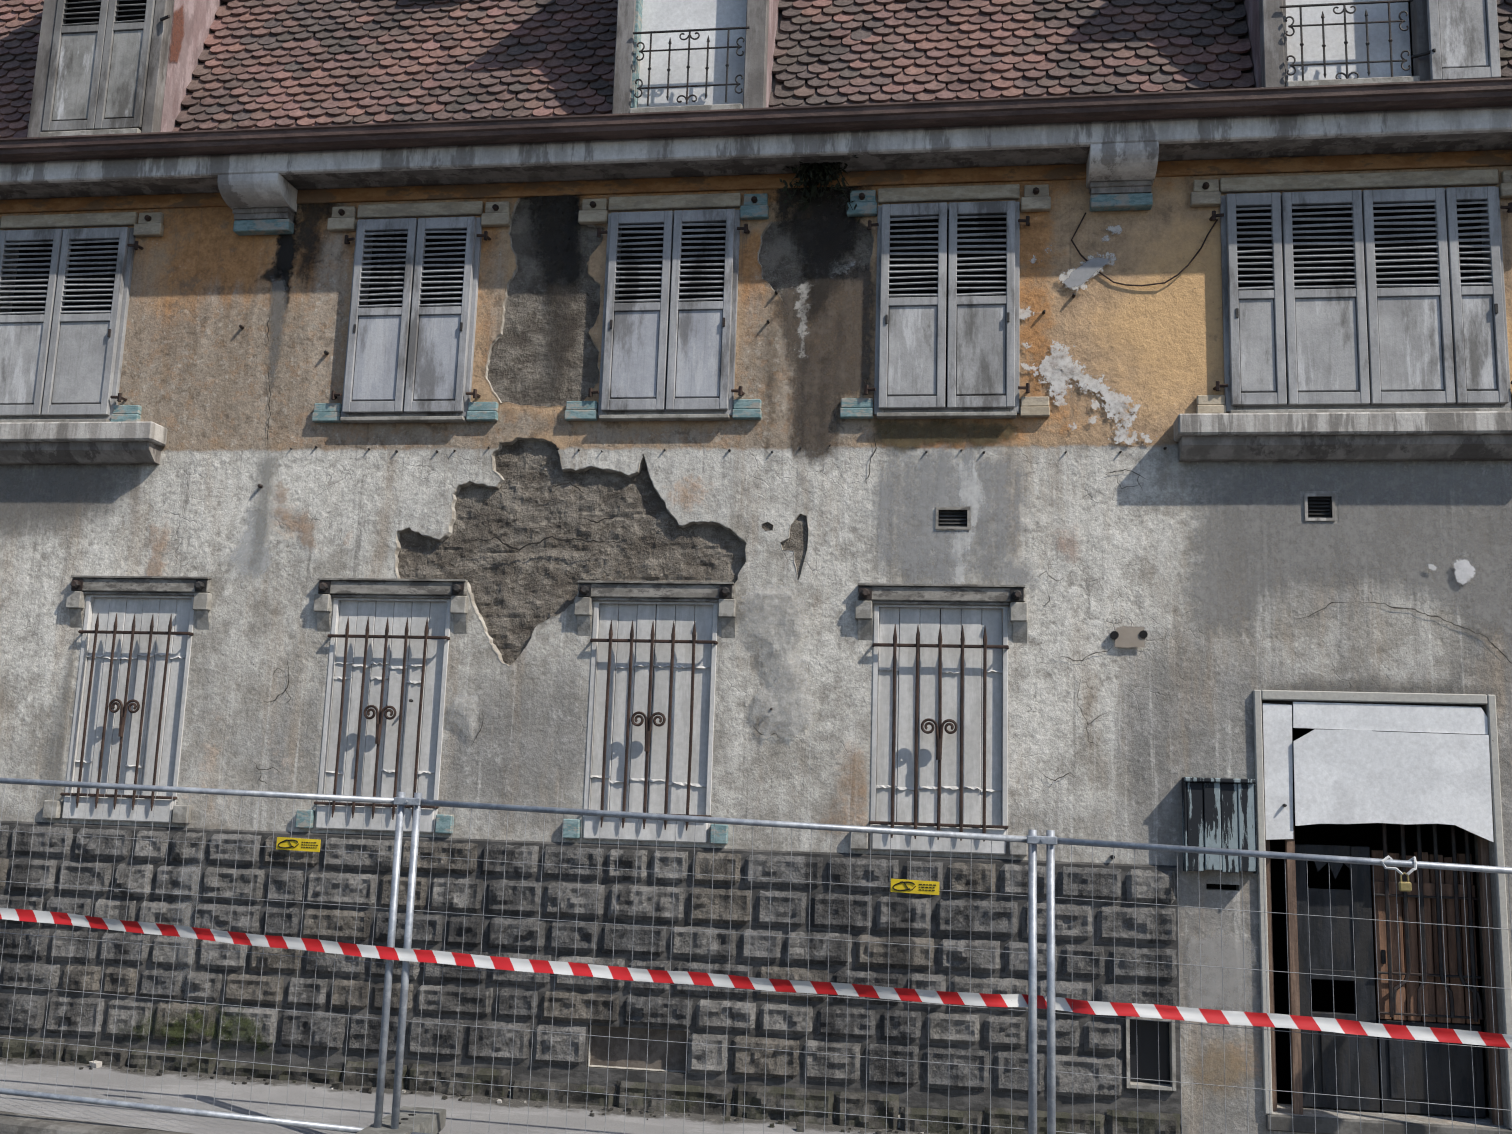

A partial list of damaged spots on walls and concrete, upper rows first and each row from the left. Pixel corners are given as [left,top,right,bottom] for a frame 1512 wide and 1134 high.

leakage [262,203,336,383]
spalling [485,195,605,408]
leakage [775,186,875,459]
peeling [1019,306,1035,320]
peeling [1059,225,1122,293]
peeling [1021,339,1157,446]
spalling [394,437,746,667]
spalling [761,514,808,580]
peeling [1428,559,1475,584]
crack [1299,601,1511,663]